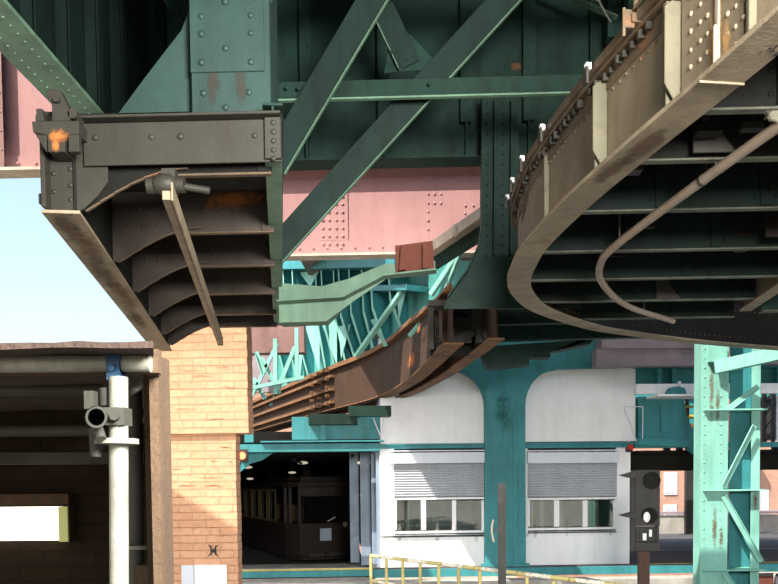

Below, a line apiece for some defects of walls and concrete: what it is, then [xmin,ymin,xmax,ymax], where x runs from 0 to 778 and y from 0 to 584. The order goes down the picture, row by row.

corrosion [708,0,731,66]
corrosion [50,131,67,150]